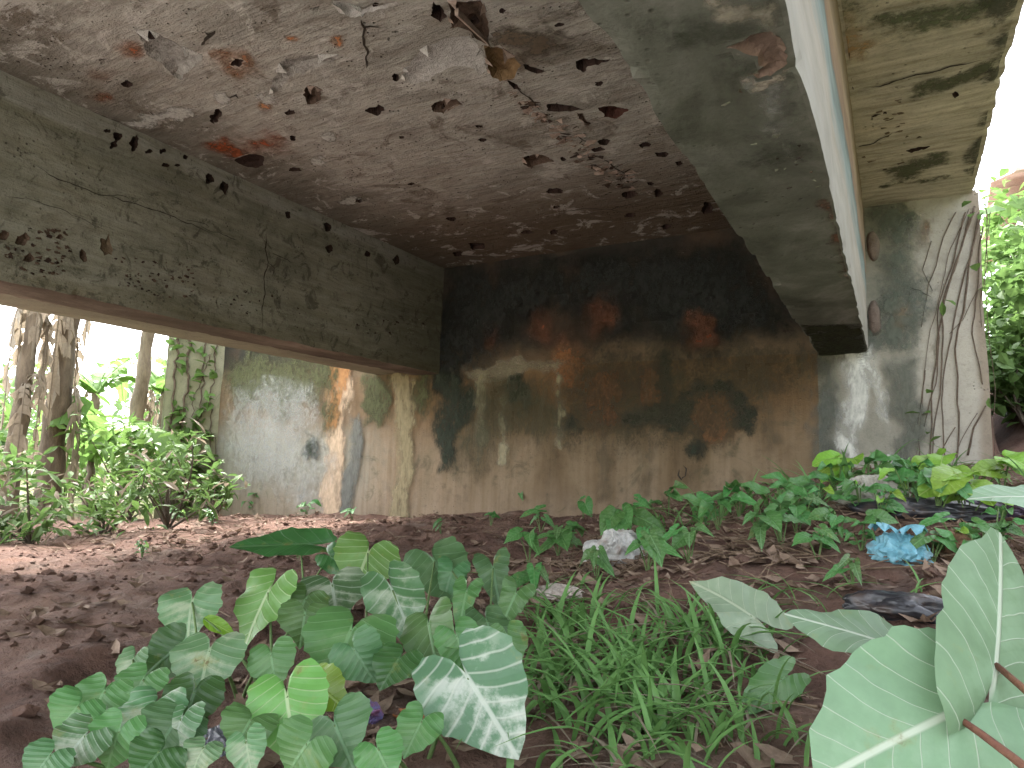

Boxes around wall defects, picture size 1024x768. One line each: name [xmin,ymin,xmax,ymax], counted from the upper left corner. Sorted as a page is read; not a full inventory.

crack [361,20,380,68]
crack [845,27,980,88]
leakage [872,0,1018,98]
spalling [392,0,663,199]
spalling [104,129,188,167]
corrosion [205,136,280,158]
leakage [879,152,950,188]
leakage [964,112,988,174]
crack [39,167,235,240]
peeling [0,227,87,277]
leakage [225,202,931,517]
corrosion [326,366,350,428]